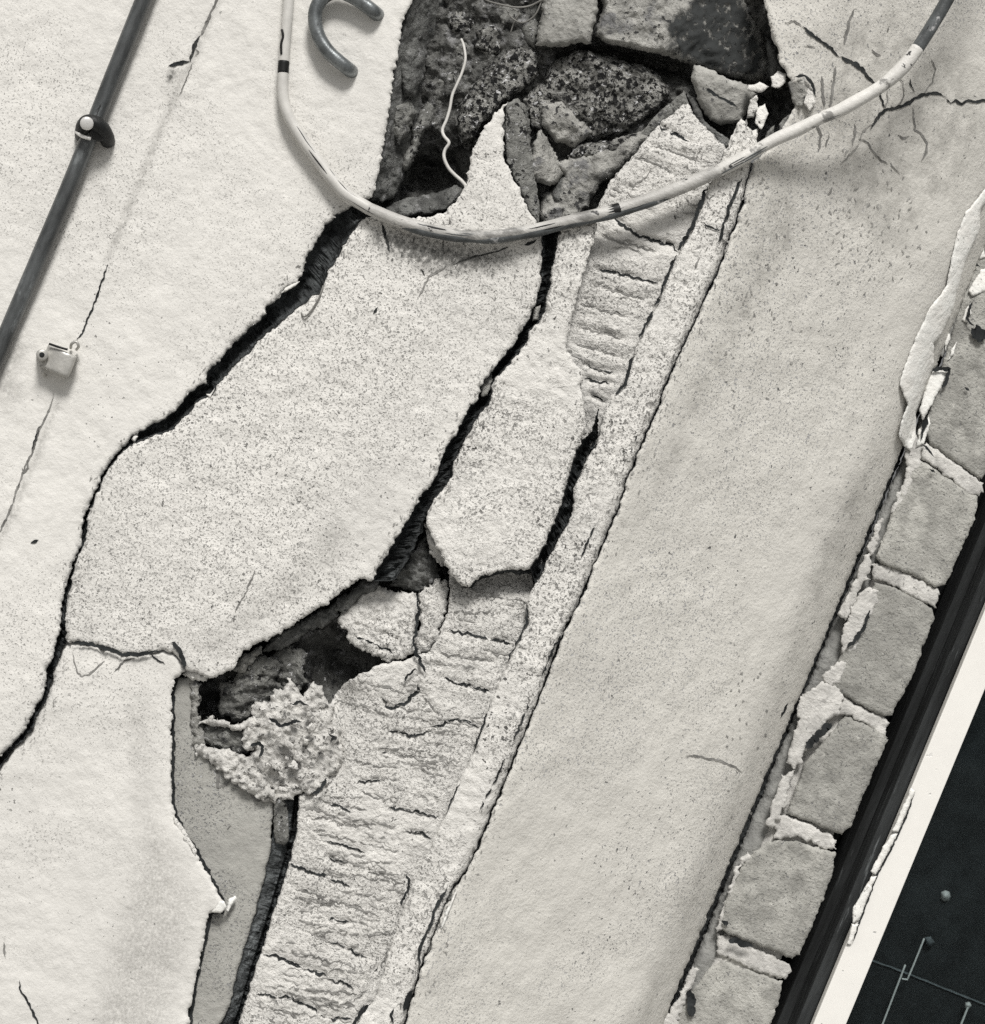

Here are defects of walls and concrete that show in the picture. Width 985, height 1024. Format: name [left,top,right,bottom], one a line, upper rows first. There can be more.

crack [169,0,218,93]
spalling [364,0,816,223]
crack [786,10,985,174]
flaking render [566,181,712,448]
peeling [899,189,985,473]
crack [0,206,415,776]
crack [372,163,765,1024]
flaking render [170,516,542,1024]
spalling [805,723,832,749]
peeling [847,788,915,945]
crack [352,1005,364,1024]
spalling [687,990,696,1017]